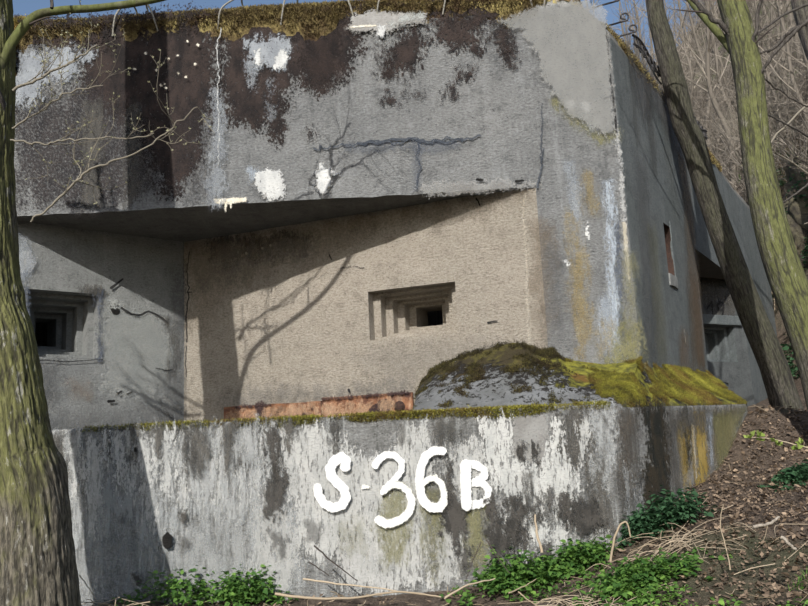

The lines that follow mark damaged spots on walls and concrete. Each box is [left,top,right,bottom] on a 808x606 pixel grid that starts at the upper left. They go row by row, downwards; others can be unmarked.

damp [15,0,522,215]
crack [313,134,481,190]
efflorescence [602,181,626,363]
damp [99,417,299,484]
rust [236,400,271,418]
damp [326,417,343,455]
rust [322,390,409,412]
damp [437,401,623,576]
damp [634,398,695,514]